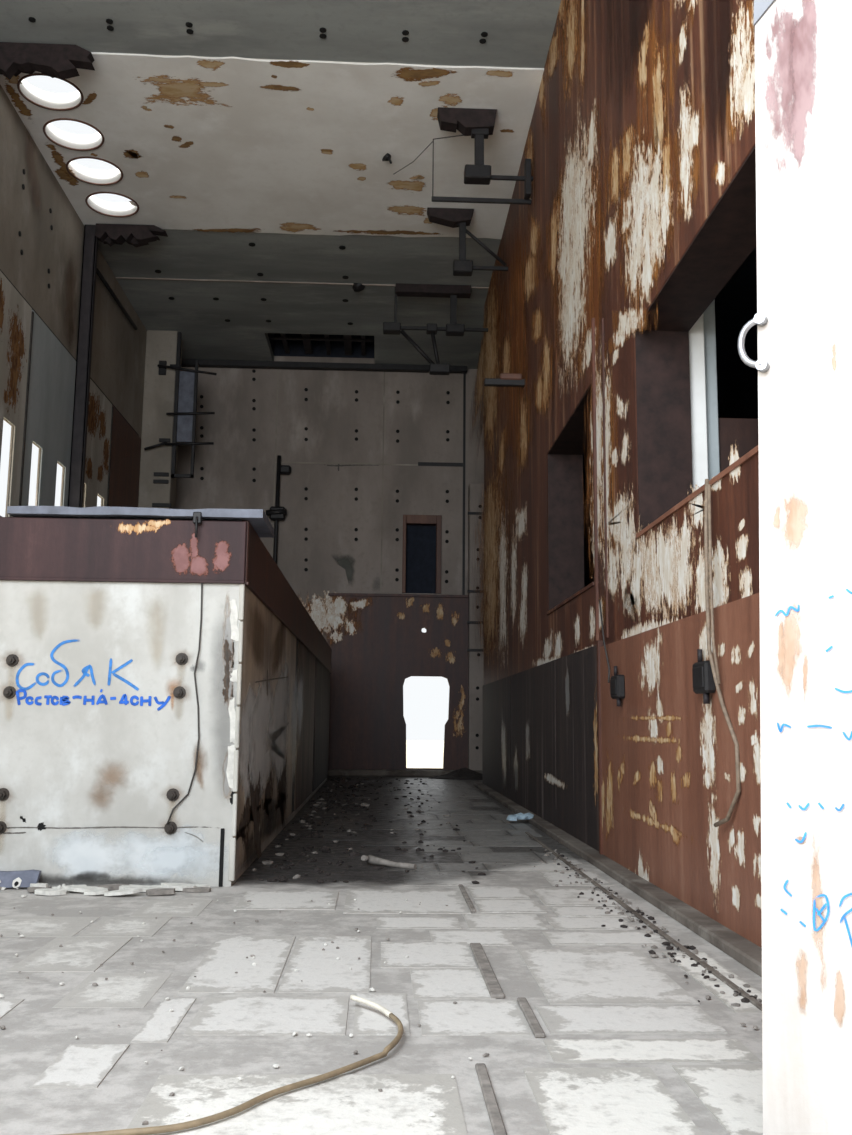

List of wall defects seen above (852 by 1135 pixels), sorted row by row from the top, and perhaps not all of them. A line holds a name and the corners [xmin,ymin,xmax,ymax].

peeling [137,60,228,111]
peeling [396,67,462,120]
rust [608,0,667,179]
rust [706,0,729,139]
rust [765,0,817,169]
rust [576,179,604,363]
peeling [469,0,761,912]
peeling [116,519,171,535]
peeling [171,533,232,576]
peeling [299,590,372,645]
rust [778,614,807,693]
leakage [240,664,289,800]